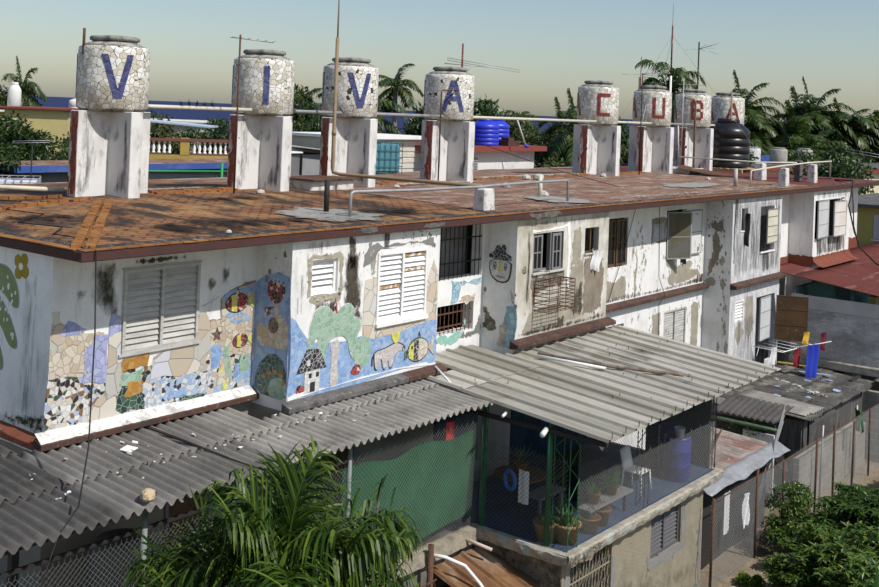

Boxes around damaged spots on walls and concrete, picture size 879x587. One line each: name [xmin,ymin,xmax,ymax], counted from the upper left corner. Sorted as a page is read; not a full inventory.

damp [97,265,115,314]
damp [316,237,361,317]
peeling [510,217,667,334]
peeling [649,307,676,335]
peeling [656,212,754,354]